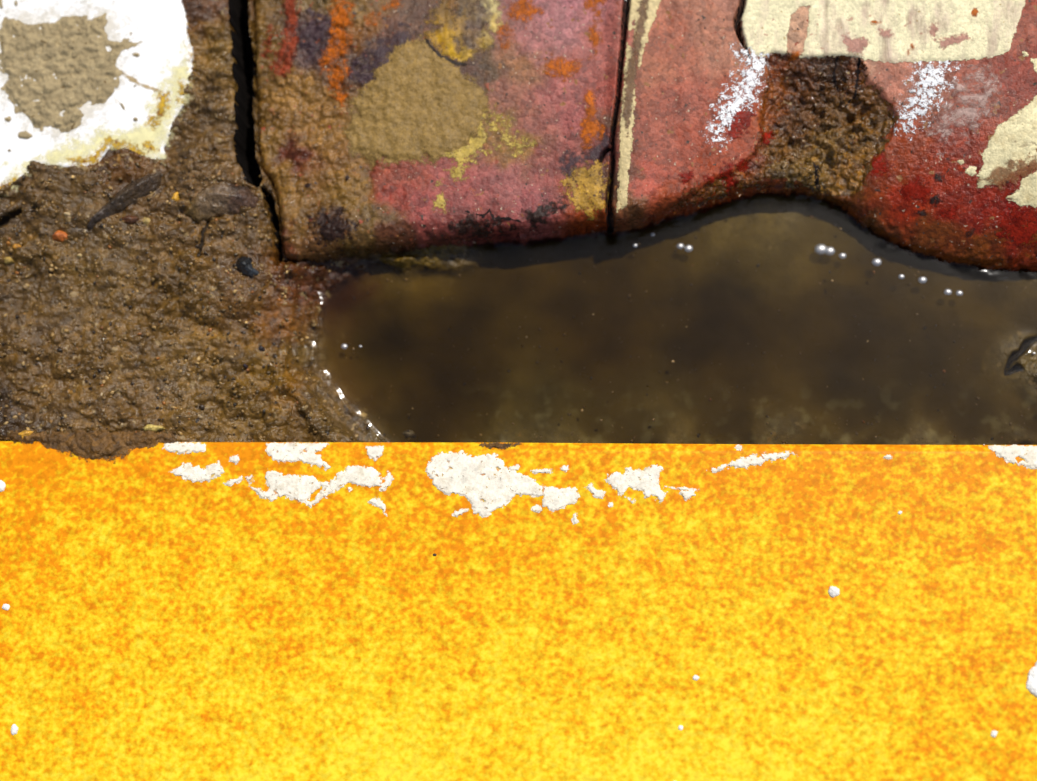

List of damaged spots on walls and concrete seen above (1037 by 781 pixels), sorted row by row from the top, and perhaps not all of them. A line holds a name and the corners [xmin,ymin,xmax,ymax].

crack [734,0,751,60]
crack [228,0,283,262]
crack [600,0,630,234]
leakage [701,44,772,152]
spalling [671,51,900,213]
leakage [308,206,359,257]
leakage [448,196,567,243]
leakage [917,195,943,216]
peeling [143,424,394,516]
peeling [425,450,697,524]
peeling [706,444,794,473]
peeling [988,444,1037,469]